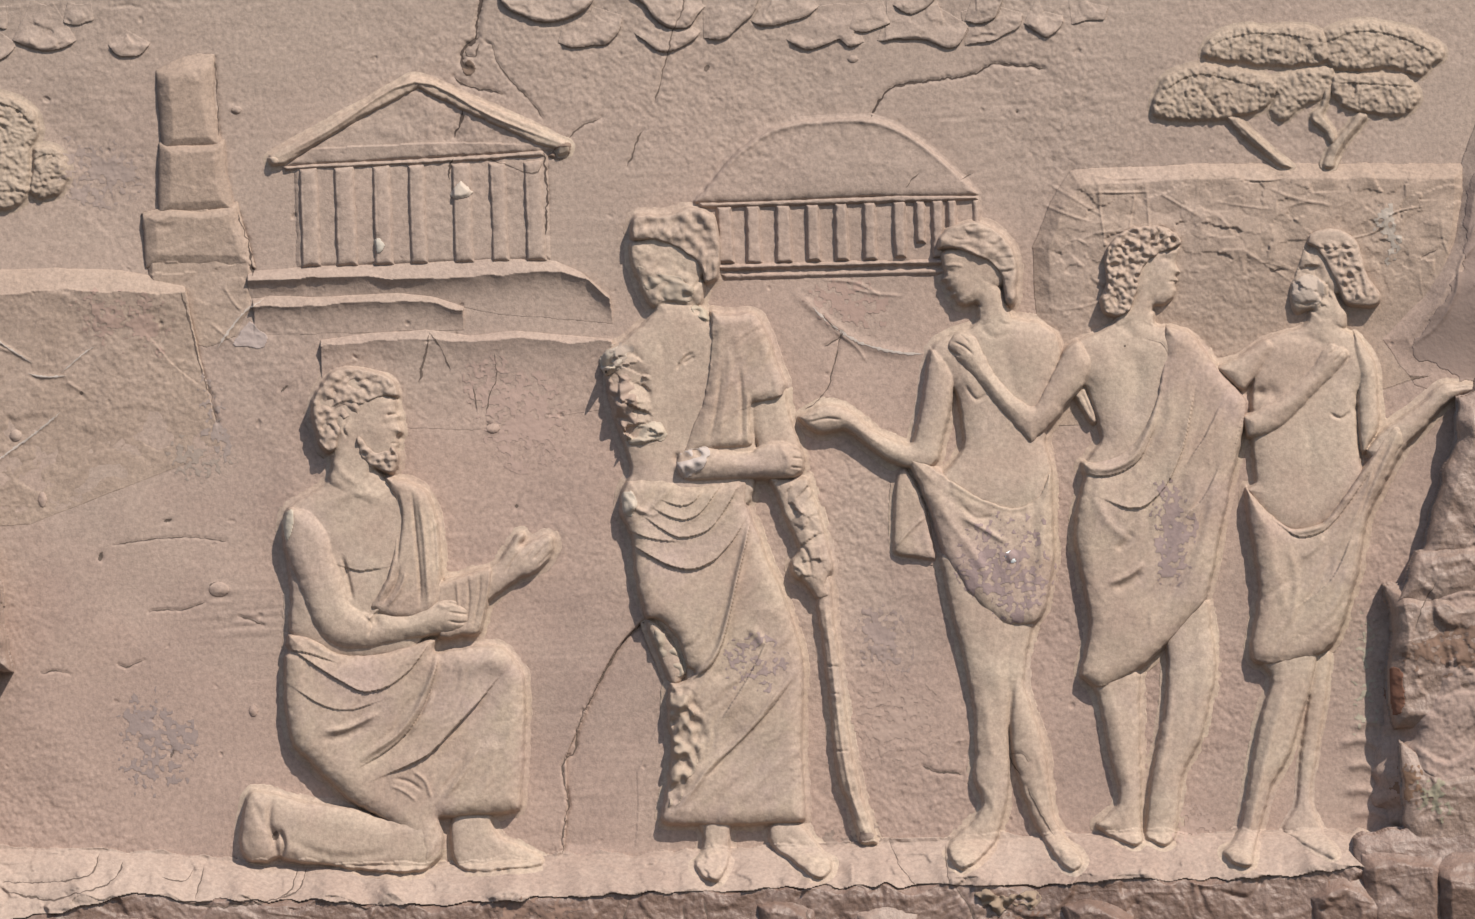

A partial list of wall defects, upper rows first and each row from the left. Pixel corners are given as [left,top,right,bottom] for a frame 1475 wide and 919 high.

crack [448,0,600,233]
crack [561,622,644,854]